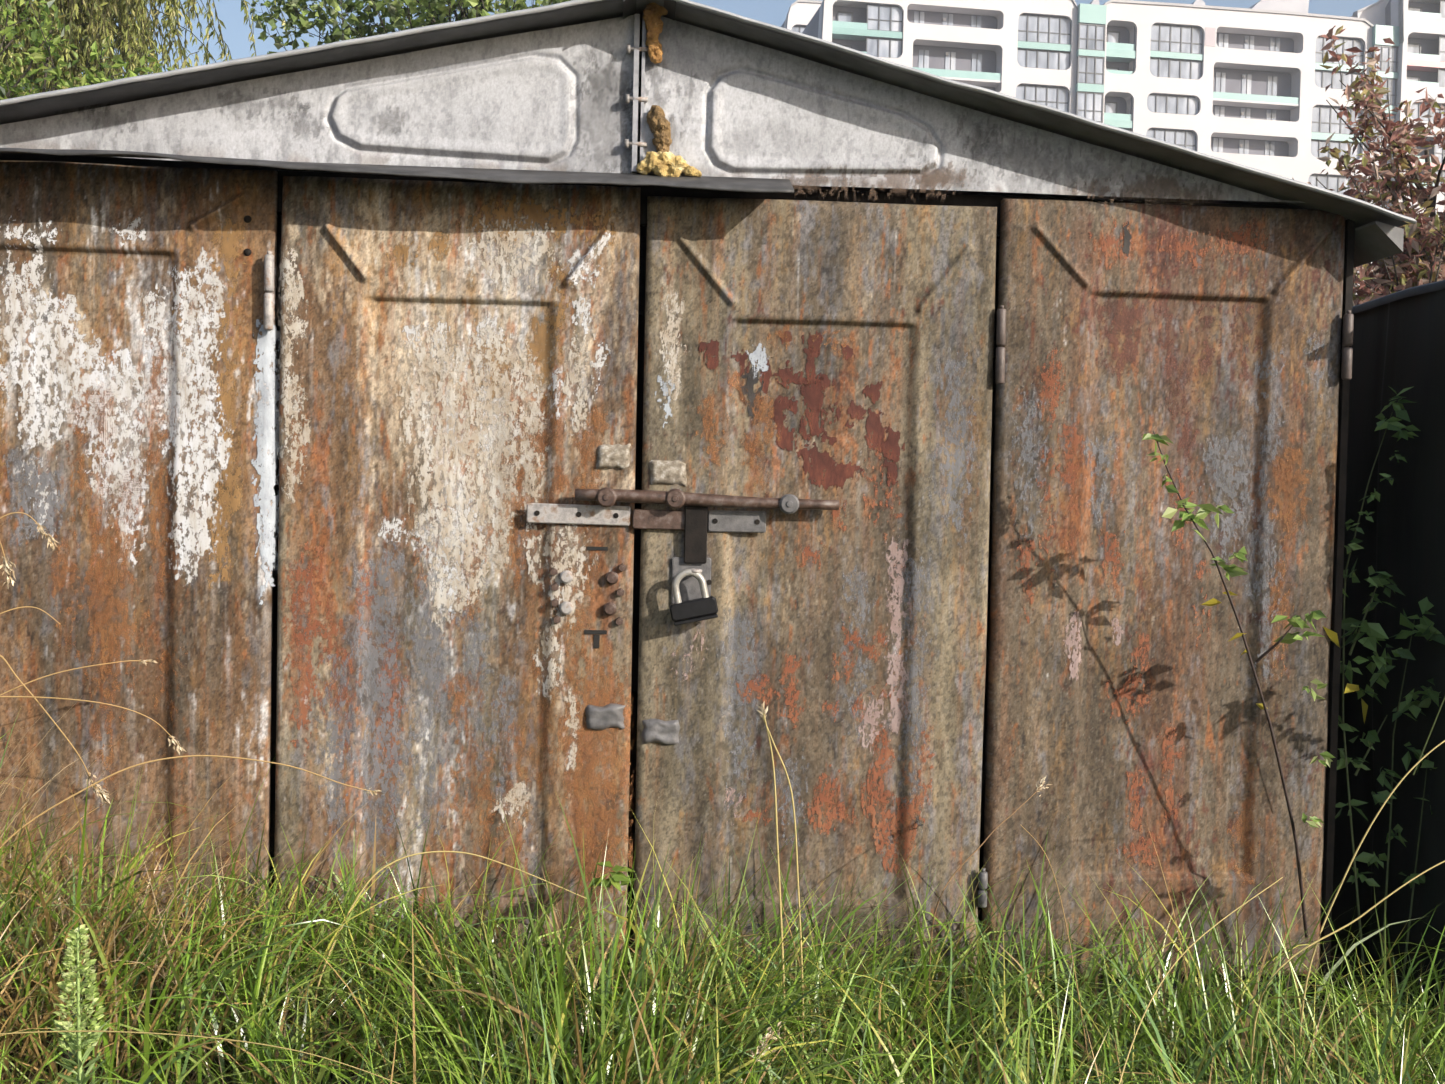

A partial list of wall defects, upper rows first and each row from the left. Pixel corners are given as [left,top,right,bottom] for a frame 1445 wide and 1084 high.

corrosion [387,194,621,270]
peeling [0,216,234,585]
corrosion [203,214,247,588]
peeling [378,296,610,633]
corrosion [460,261,610,629]
corrosion [695,324,906,570]
corrosion [1016,350,1084,623]
corrosion [1092,287,1263,555]
corrosion [281,541,409,834]
corrosion [444,561,636,902]
corrosion [1103,631,1153,725]
corrosion [1116,723,1185,870]